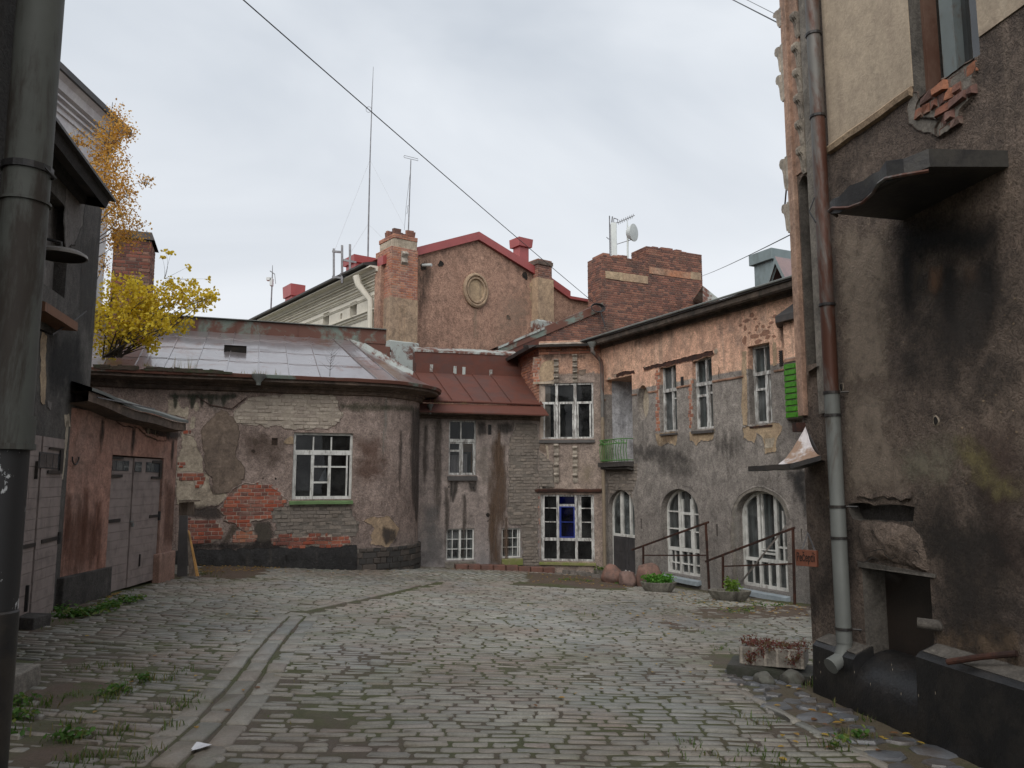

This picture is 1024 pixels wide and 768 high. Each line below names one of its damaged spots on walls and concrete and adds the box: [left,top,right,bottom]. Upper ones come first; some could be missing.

flaking render [906,56,979,138]
flaking render [167,394,400,549]
leakage [489,431,508,564]
spalling [644,367,715,447]
spalling [738,312,783,454]